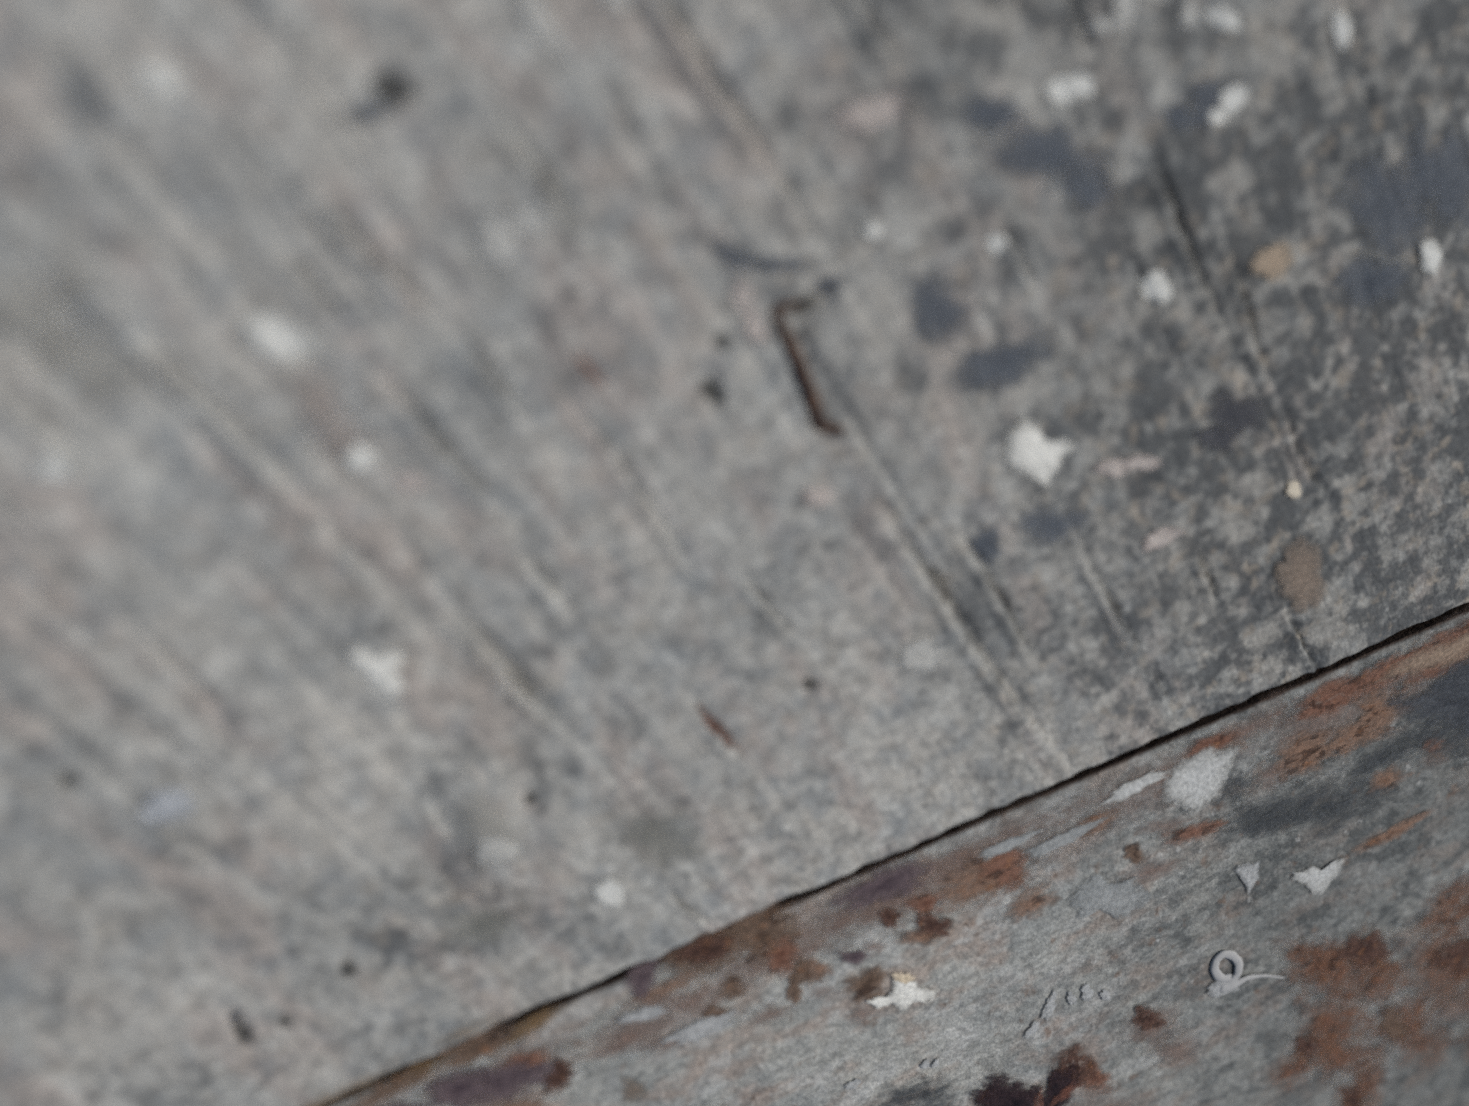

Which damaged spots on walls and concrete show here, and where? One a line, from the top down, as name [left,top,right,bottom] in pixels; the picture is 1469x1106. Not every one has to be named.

rust [1302,621,1469,719]
rust [1189,726,1253,756]
rust [834,849,1051,945]
rust [626,905,886,1018]
rust [1292,930,1392,997]
rust [355,1011,573,1106]
rust [971,1044,1109,1106]